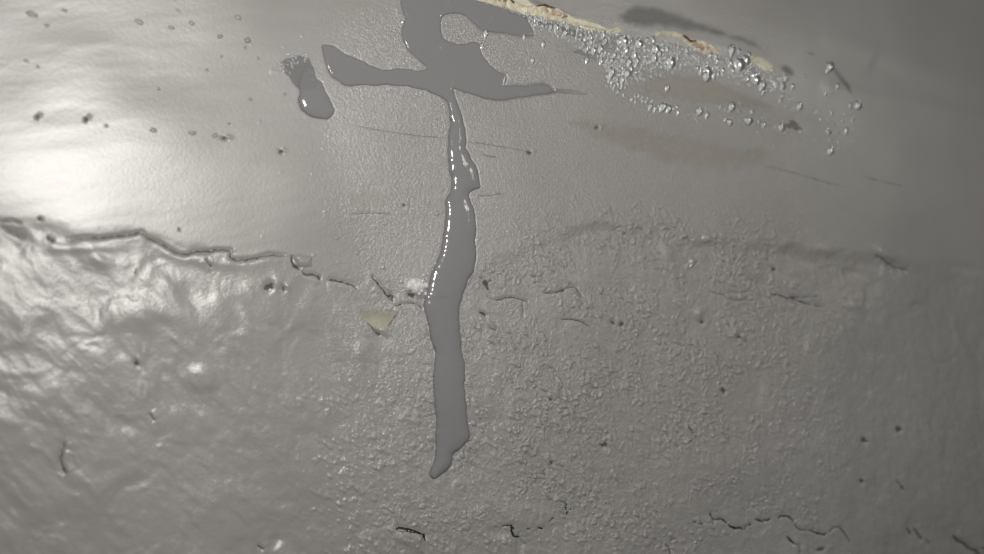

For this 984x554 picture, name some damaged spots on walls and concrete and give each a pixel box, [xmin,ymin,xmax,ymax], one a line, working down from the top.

spalling [478,0,623,35]
leakage [281,56,335,120]
leakage [406,278,425,293]
crack [694,514,851,553]